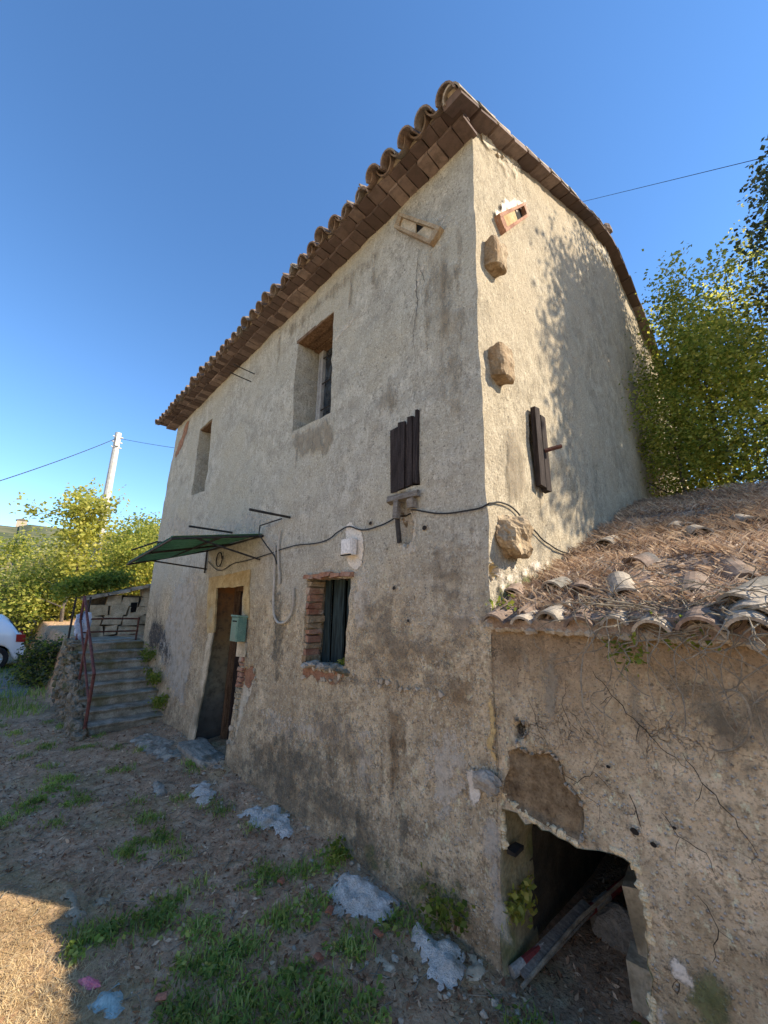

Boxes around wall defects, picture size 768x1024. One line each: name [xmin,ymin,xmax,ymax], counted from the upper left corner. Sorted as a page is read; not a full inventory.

crack [409,259,425,357]
spalling [226,665,256,745]
damp [242,704,376,849]
damp [425,727,471,817]
peeling [498,737,585,850]
spalling [609,845,656,947]
spalling [646,992,657,1024]